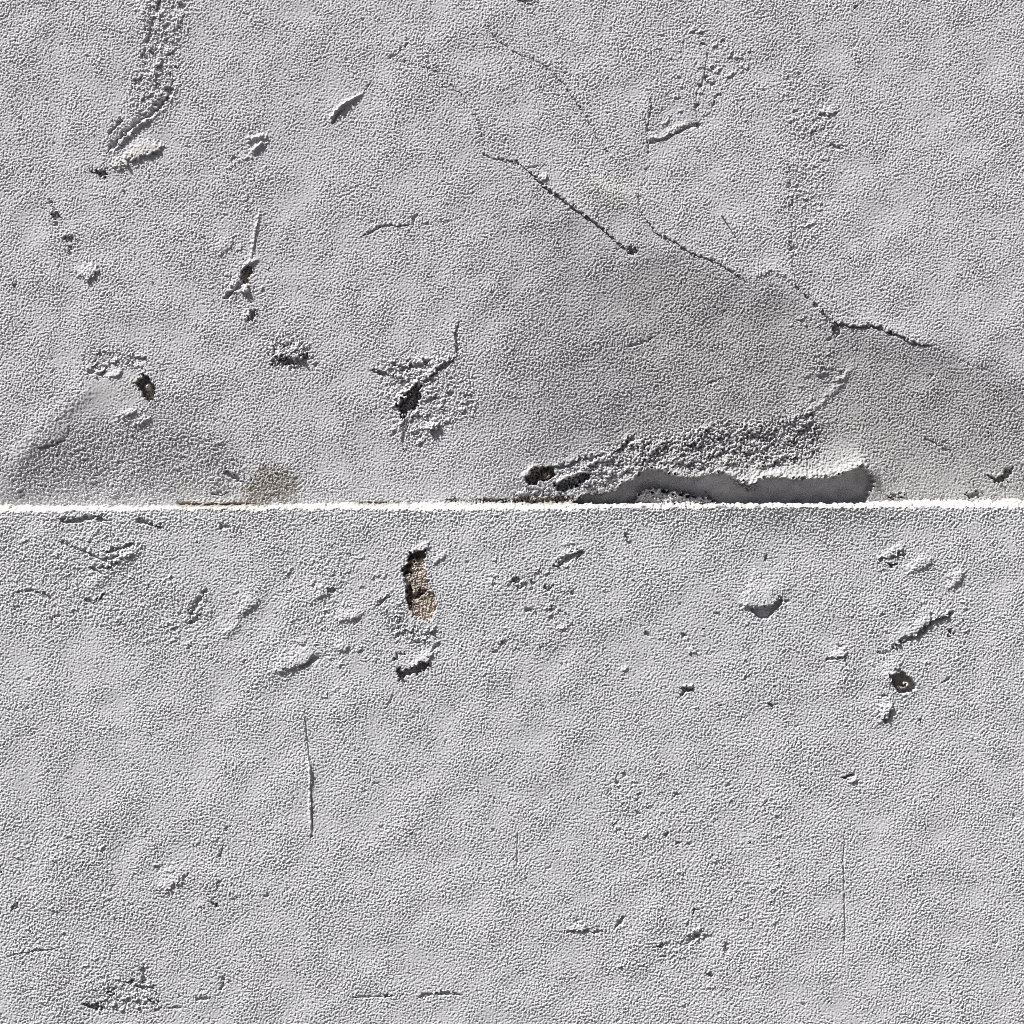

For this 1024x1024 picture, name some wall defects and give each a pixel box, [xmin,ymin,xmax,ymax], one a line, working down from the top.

crack [326,21,1010,377]
peeling [76,335,159,428]
hole [360,318,497,473]
spalling [508,357,1024,510]
spalling [311,579,339,601]
spalling [333,537,452,712]
hole [876,658,920,725]